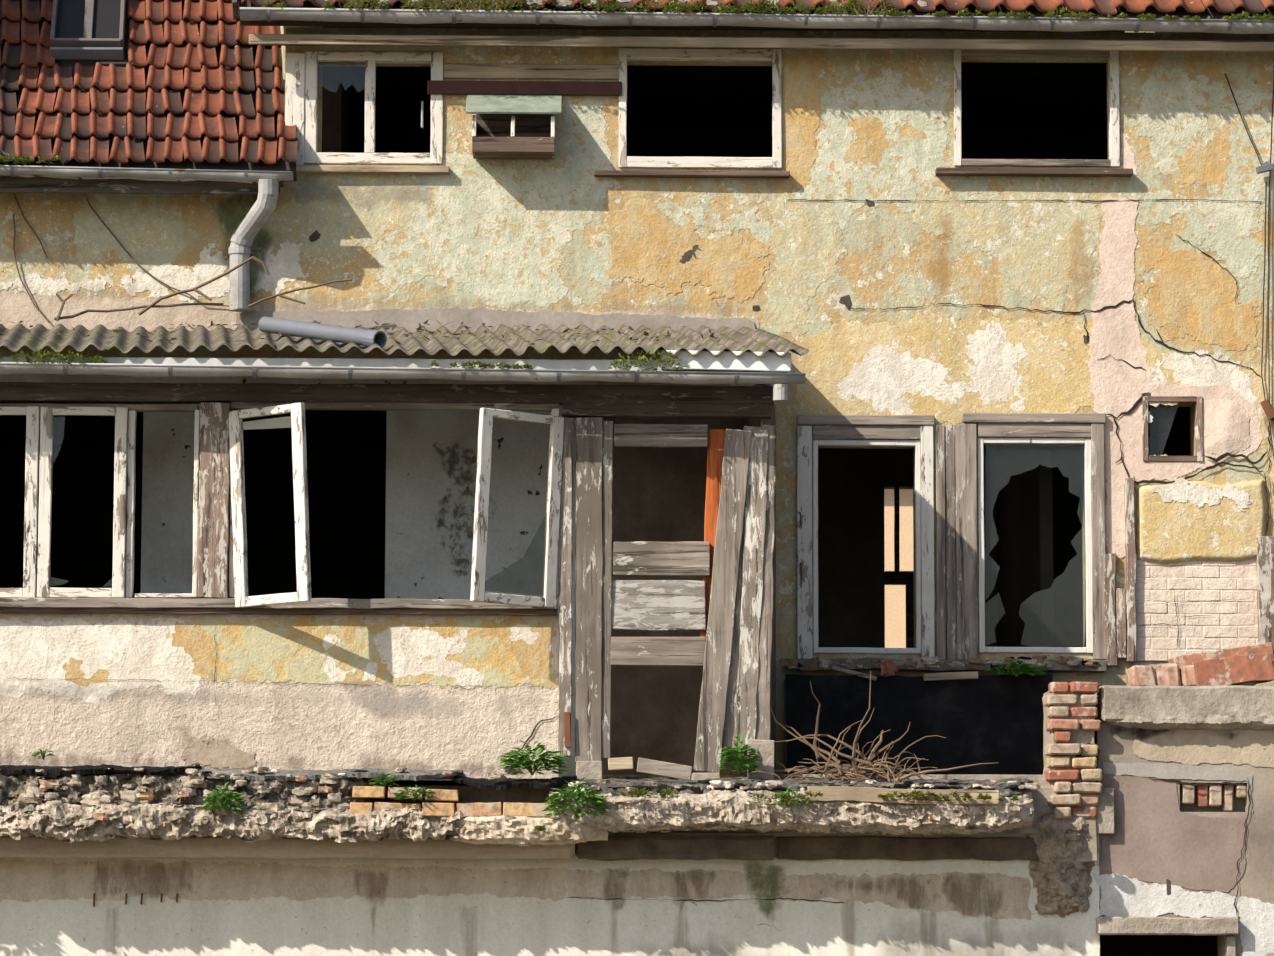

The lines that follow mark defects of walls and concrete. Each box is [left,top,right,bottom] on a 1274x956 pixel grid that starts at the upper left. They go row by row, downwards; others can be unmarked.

peeling [0,202,230,303]
crack [792,199,1261,207]
peeling [1130,57,1274,521]
crack [1177,235,1238,304]
crack [849,299,1274,535]
damp [433,444,477,575]
peeling [0,615,559,706]
flaking render [1076,743,1274,956]
crack [1150,777,1251,916]